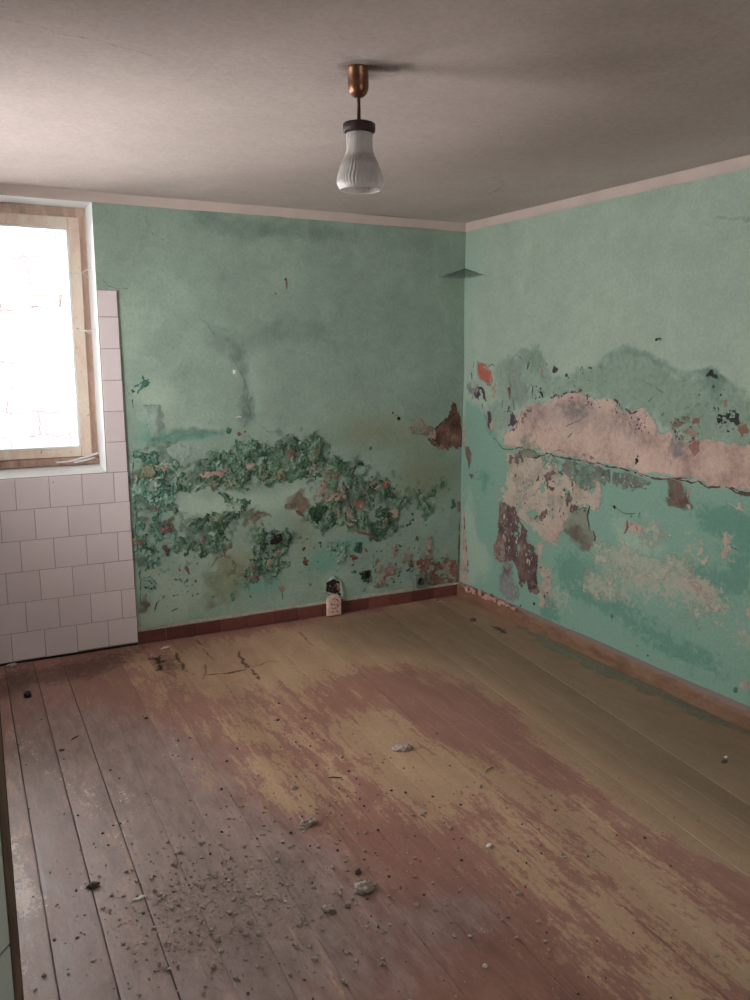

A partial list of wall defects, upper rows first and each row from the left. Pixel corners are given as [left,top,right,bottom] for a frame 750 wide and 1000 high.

peeling [476,361,494,387]
spalling [392,401,479,480]
peeling [487,354,750,627]
crack [493,438,750,496]
peeling [299,512,521,611]